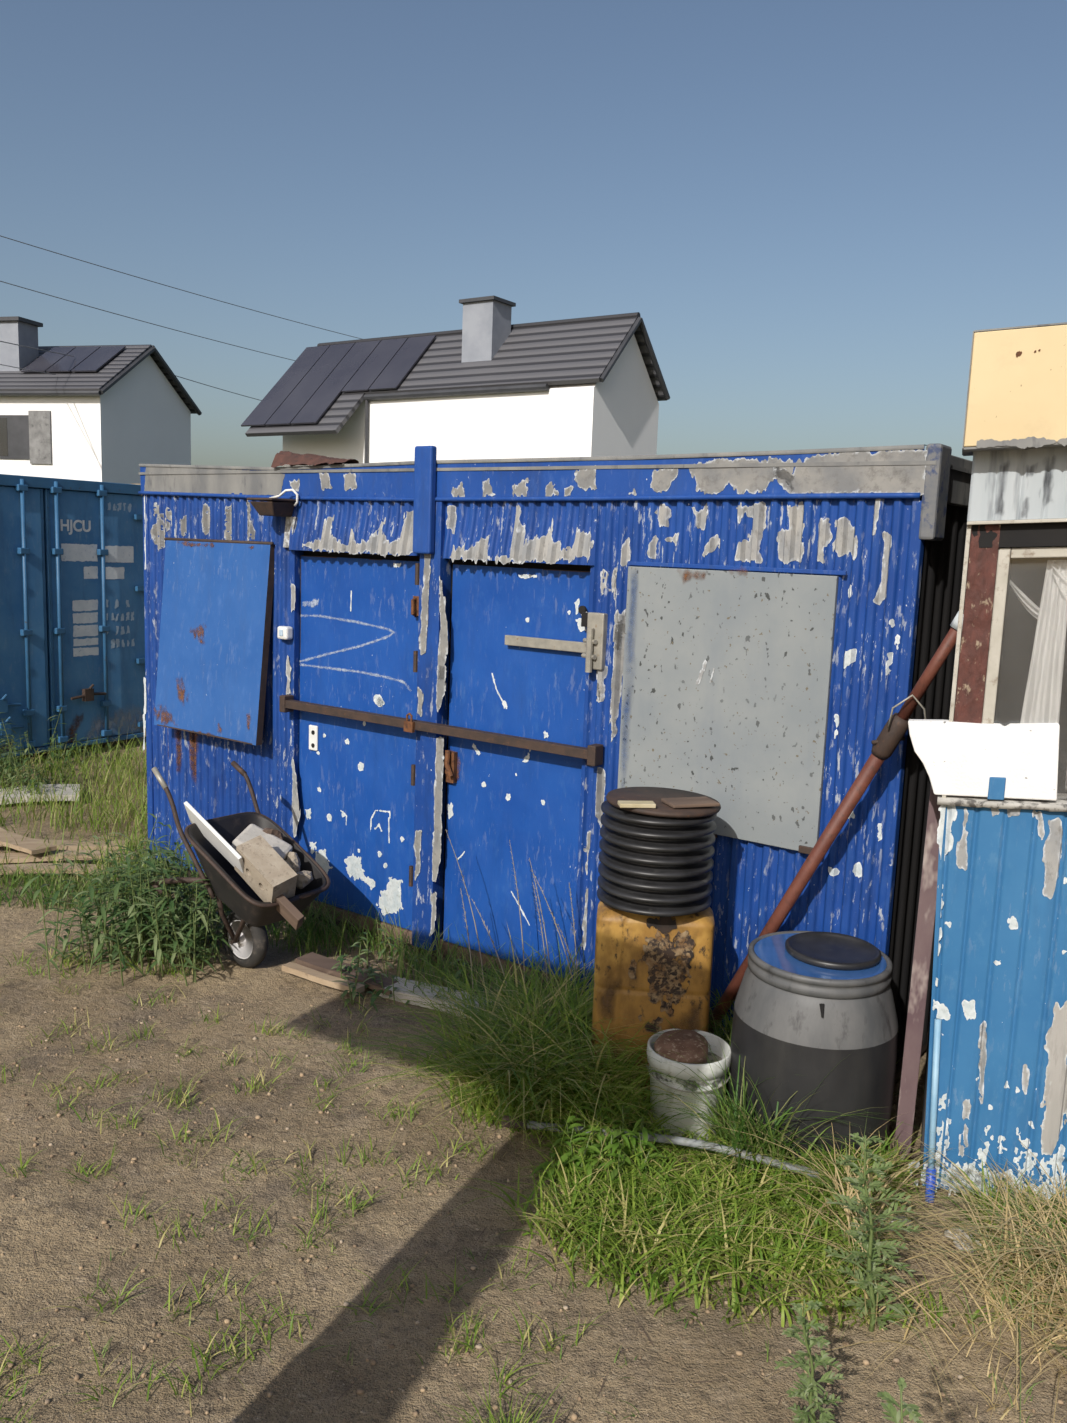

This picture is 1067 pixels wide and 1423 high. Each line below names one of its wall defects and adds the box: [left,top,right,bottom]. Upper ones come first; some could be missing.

peeling [302,511,448,717]
peeling [446,449,927,742]
peeling [291,737,453,936]
peeling [581,767,606,978]
peeling [938,885,951,956]
peeling [937,805,969,871]
peeling [1007,916,1018,930]
peeling [991,808,1067,899]
peeling [906,978,1067,1211]